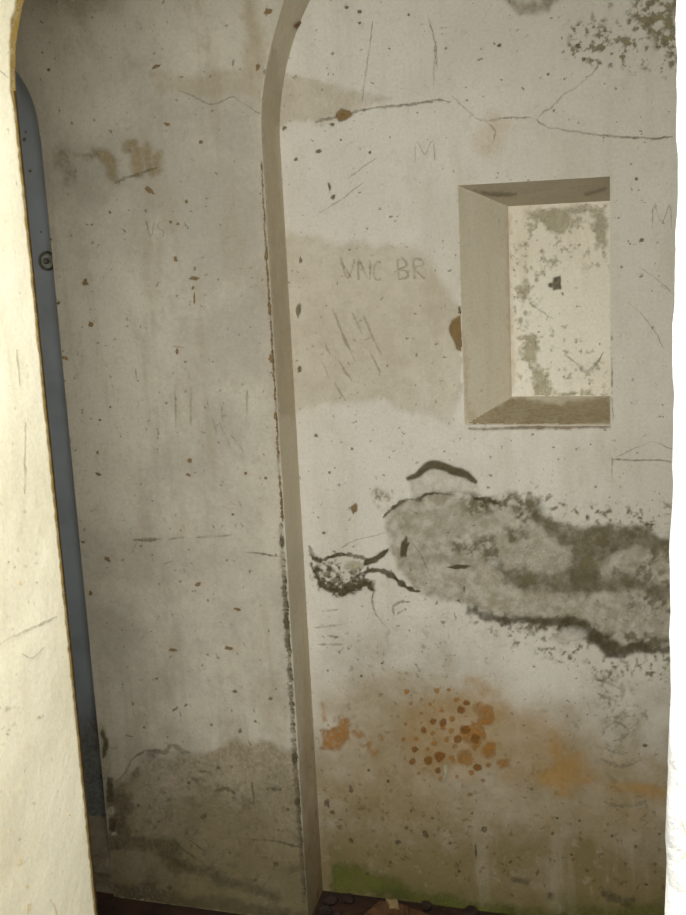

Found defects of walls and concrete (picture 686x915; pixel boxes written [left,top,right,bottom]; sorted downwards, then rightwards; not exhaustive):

flaking render [568,0,677,69]
flaking render [527,206,606,243]
flaking render [549,276,561,290]
flaking render [518,335,551,396]
damp [10,0,98,915]
damp [422,492,670,673]
corrosion [323,719,348,749]
corrosion [402,688,506,782]